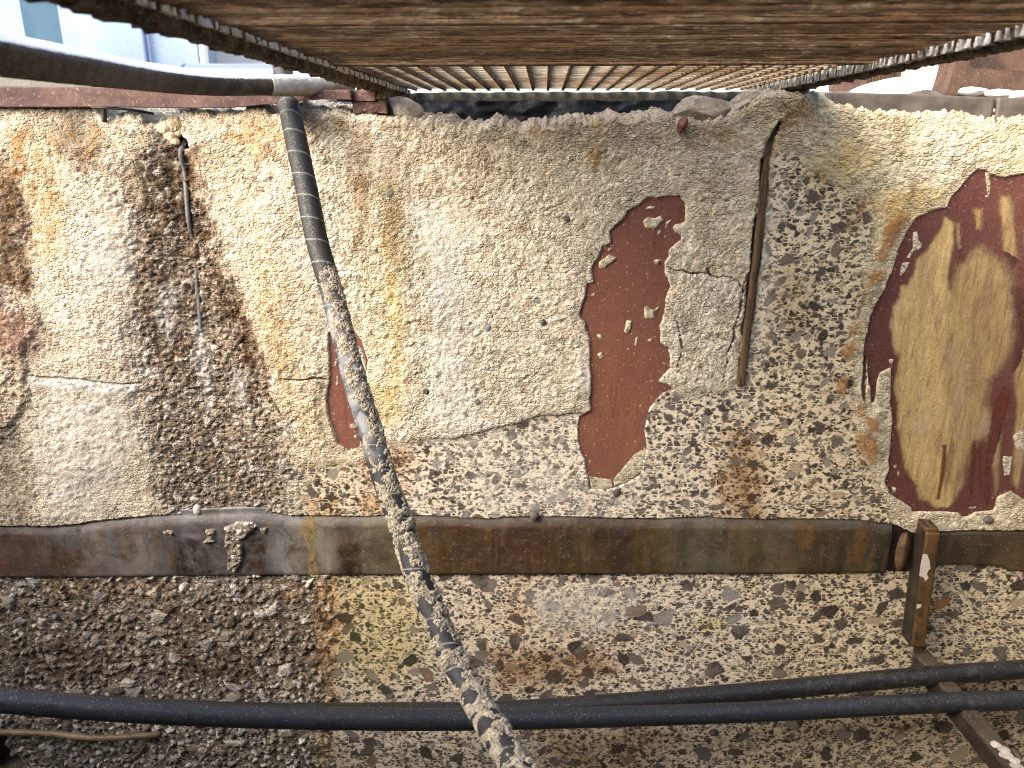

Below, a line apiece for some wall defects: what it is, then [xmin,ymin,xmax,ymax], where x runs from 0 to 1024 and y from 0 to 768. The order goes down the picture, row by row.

crack [760,121,781,173]
peeling [327,333,360,450]
peeling [354,331,368,373]
peeling [409,195,685,518]
crack [667,217,759,372]
corrosion [842,210,909,359]
peeling [864,170,1024,524]